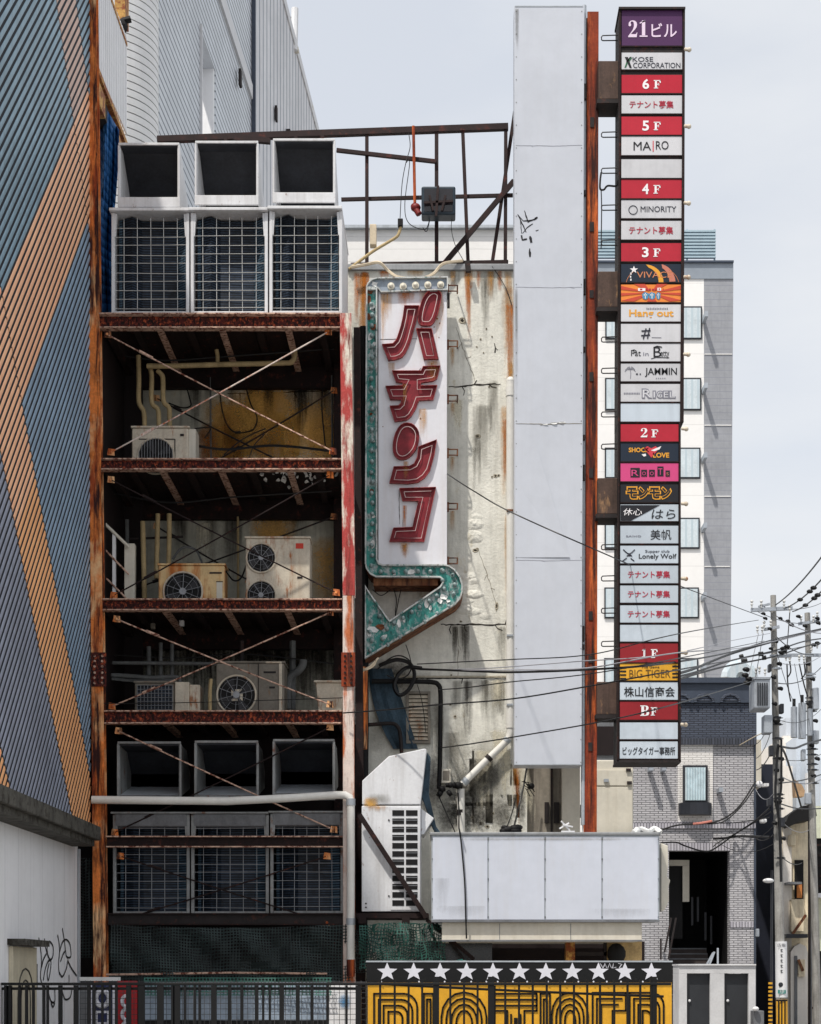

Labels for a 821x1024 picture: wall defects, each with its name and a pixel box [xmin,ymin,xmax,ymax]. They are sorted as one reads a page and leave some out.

corrosion [355,272,368,325]
corrosion [466,271,513,351]
water stain [200,390,334,458]
water stain [453,627,468,644]
water stain [444,731,527,825]